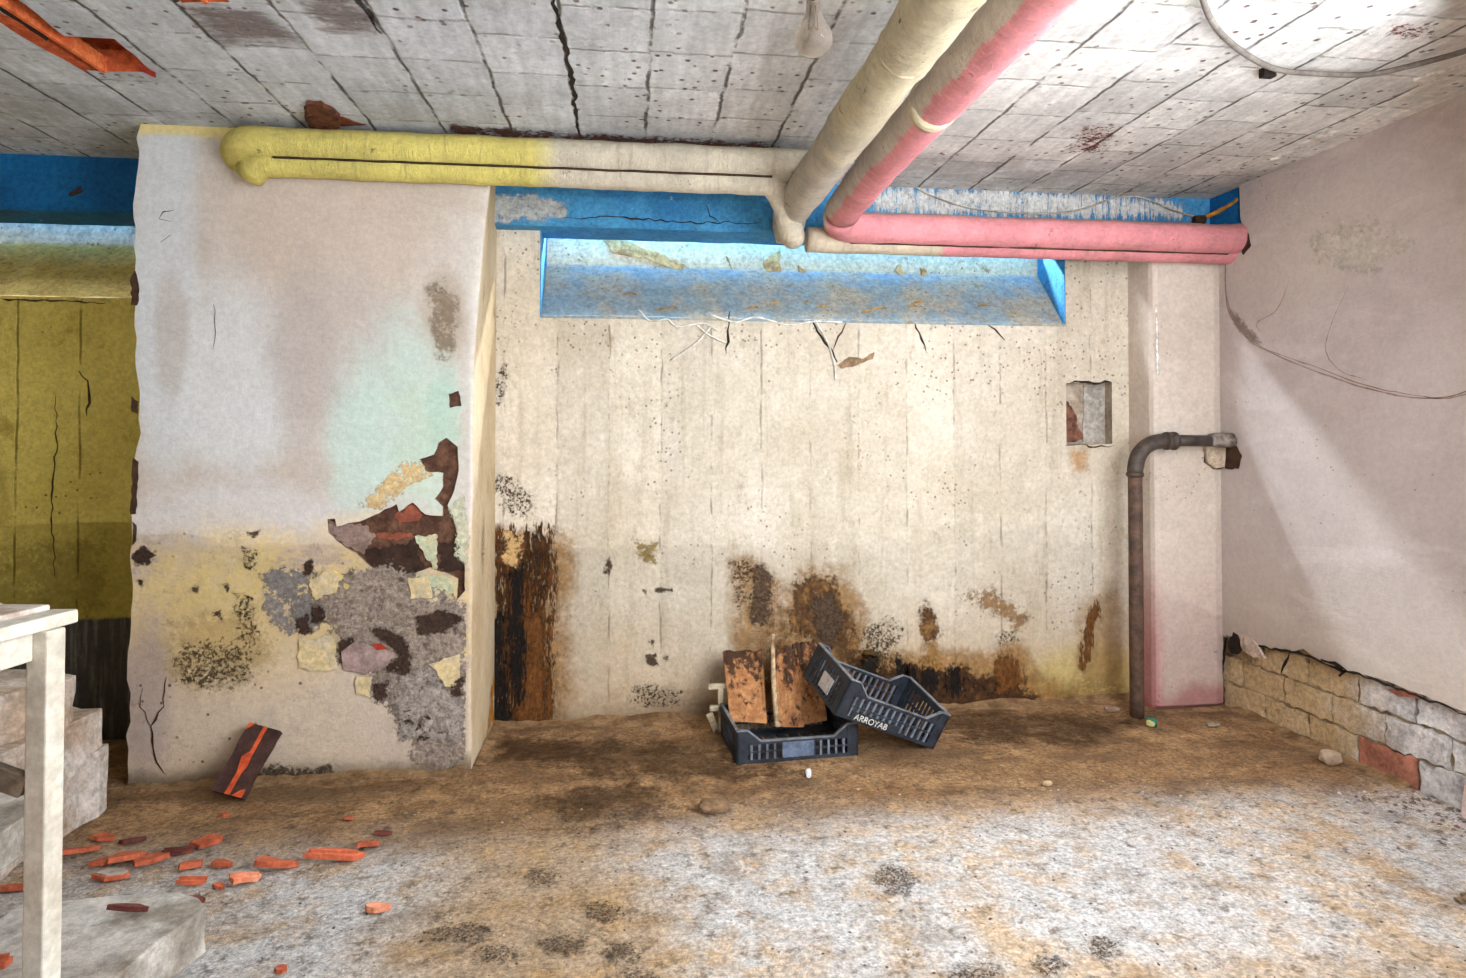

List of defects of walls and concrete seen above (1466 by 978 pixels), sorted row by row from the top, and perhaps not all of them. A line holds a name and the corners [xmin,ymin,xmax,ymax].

crack [355,0,382,34]
crack [550,0,580,134]
crack [50,371,91,576]
spalling [173,438,485,770]
flaking render [1223,632,1466,811]